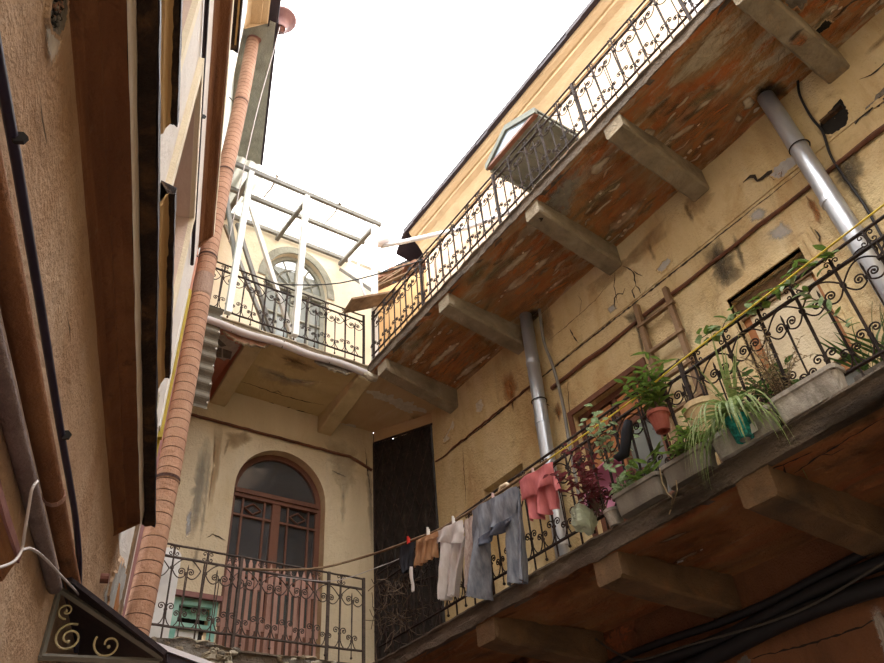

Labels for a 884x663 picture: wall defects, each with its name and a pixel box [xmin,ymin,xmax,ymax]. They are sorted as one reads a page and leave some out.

leakage [707,239,743,283]
crack [451,170,800,502]
spalling [151,636,240,663]
spalling [277,654,337,663]
crack [752,615,884,659]